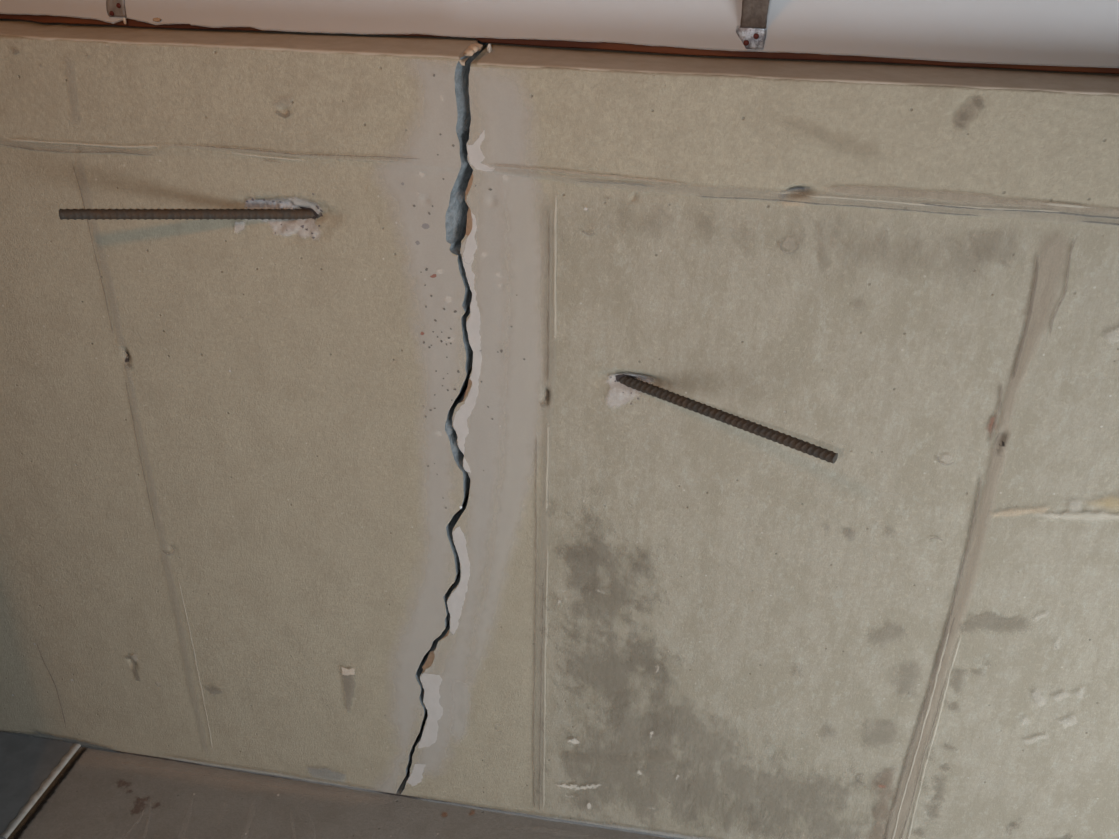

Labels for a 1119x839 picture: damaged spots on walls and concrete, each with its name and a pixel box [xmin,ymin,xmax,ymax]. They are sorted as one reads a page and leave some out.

peeling [418,673,443,748]
crack [397,43,492,793]
peeling [447,526,470,634]
damp [529,481,895,839]